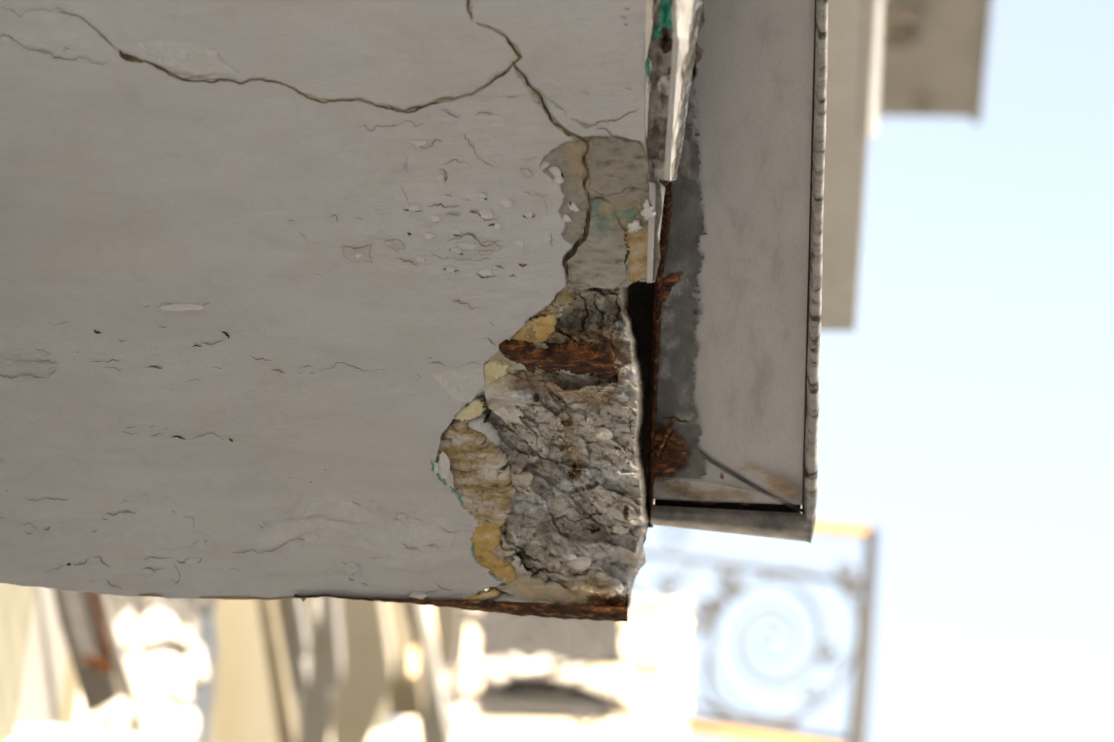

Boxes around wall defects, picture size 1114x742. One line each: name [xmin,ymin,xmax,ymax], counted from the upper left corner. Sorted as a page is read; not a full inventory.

crack [0,0,638,277]
spalling [287,0,708,606]
rust [648,179,747,528]
rust [587,592,630,607]